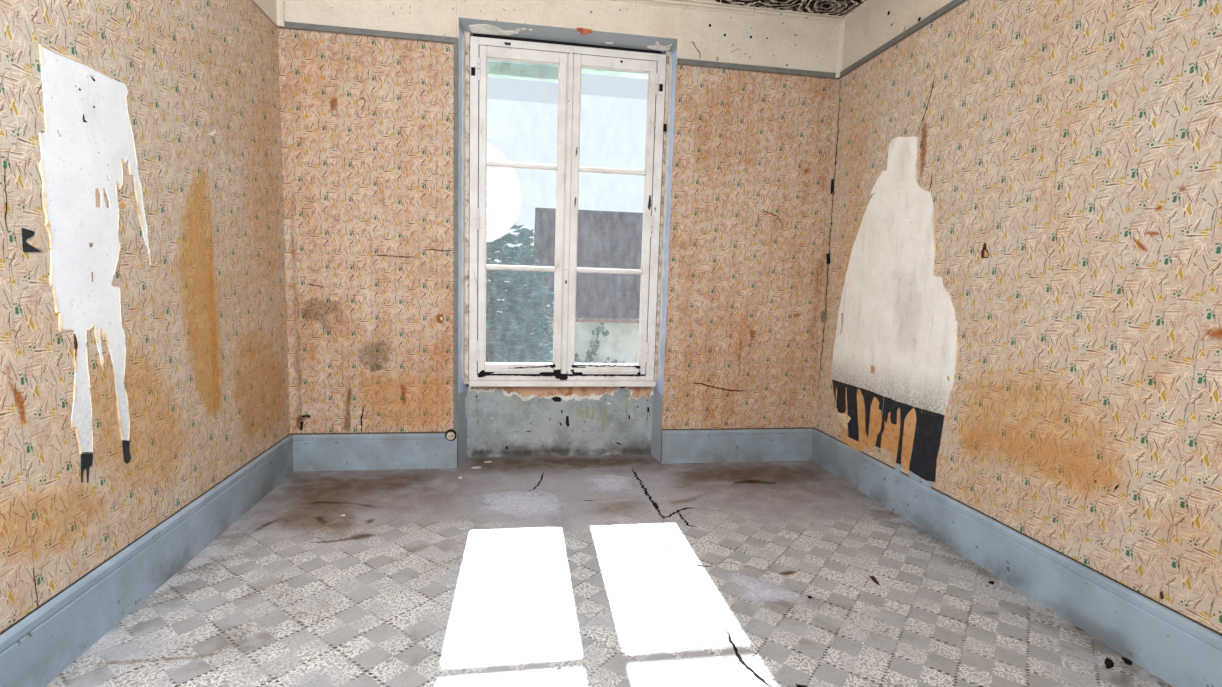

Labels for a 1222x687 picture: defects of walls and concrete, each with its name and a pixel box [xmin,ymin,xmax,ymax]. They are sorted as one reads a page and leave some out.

peeling [647,41,672,51]
flaking render [461,24,654,427]
peeling [837,413,862,452]
crack [584,468,698,562]